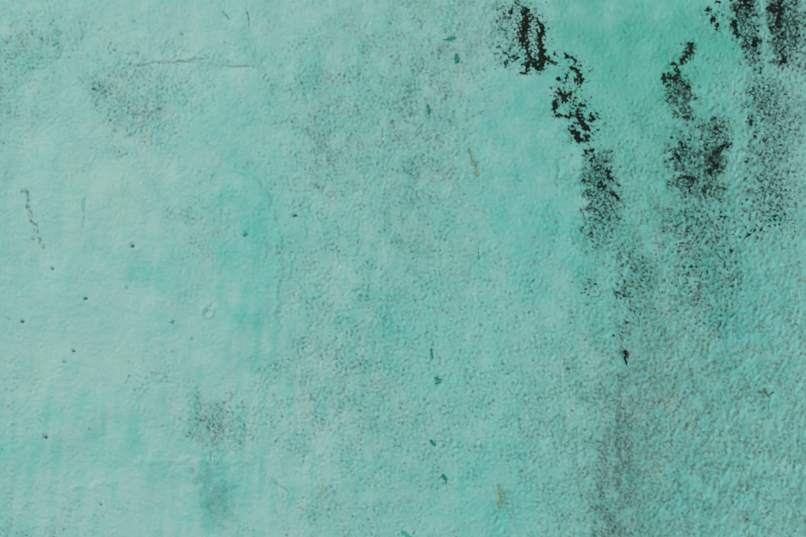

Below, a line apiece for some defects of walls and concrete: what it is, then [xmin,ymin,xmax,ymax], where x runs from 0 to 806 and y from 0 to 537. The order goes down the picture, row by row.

leakage [491,0,625,259]
leakage [612,240,658,336]
leakage [661,0,806,341]